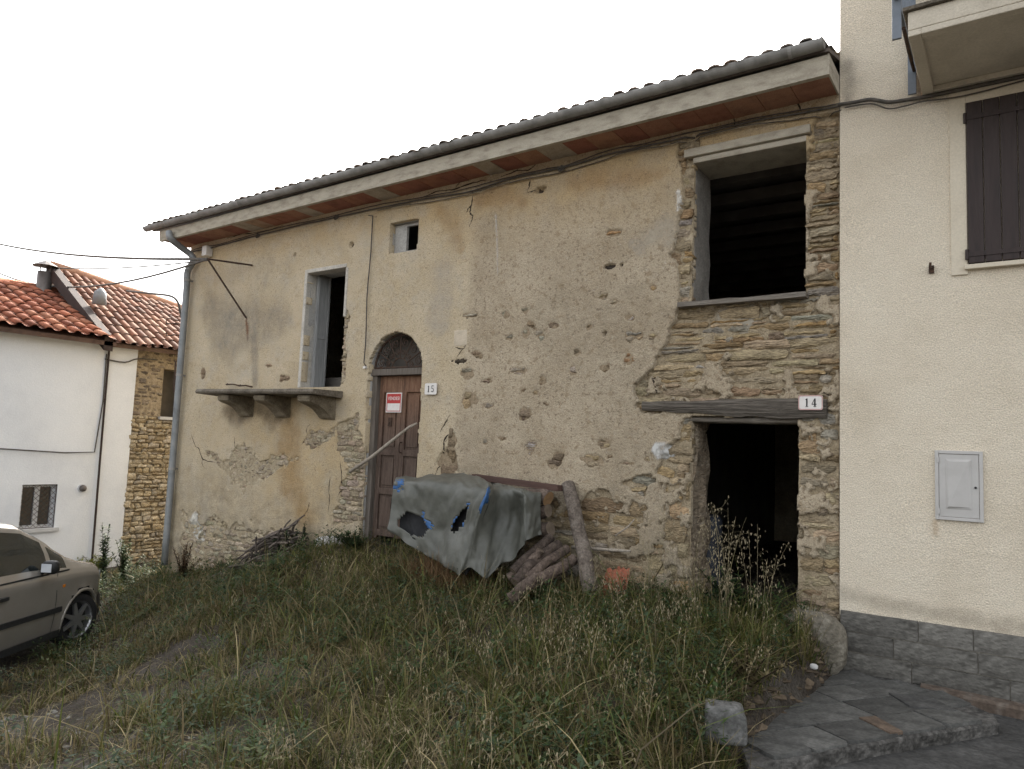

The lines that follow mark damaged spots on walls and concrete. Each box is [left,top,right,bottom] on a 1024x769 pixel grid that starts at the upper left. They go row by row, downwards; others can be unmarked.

crack [426,164,540,227]
flaking render [624,116,840,620]
flaking render [519,407,533,421]
flaking render [206,443,299,495]
flaking render [304,413,368,524]
flaking render [437,428,458,474]
flaking render [547,451,565,469]
flaking render [580,416,696,600]
flaking render [180,510,275,572]
flaking render [515,500,581,591]